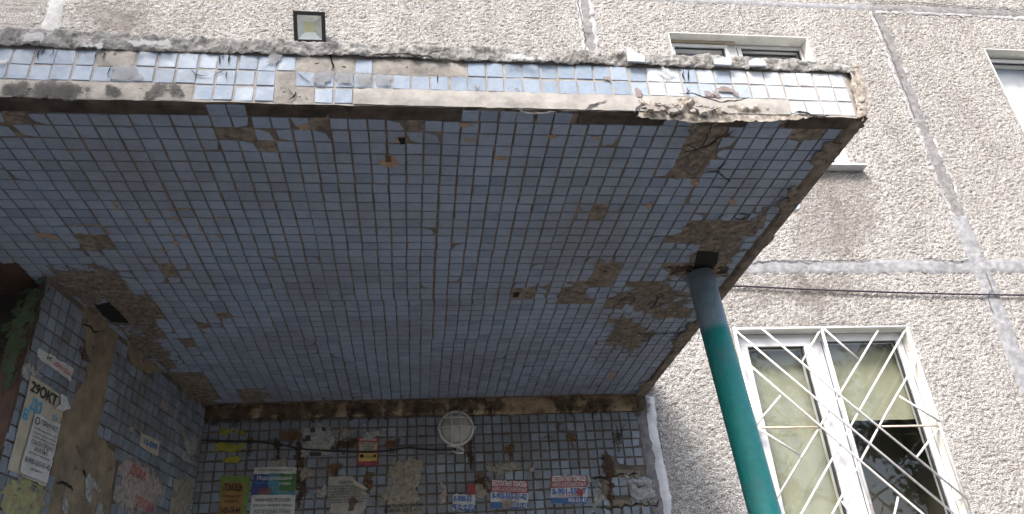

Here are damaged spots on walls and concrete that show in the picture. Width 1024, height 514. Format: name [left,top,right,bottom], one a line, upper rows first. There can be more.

peeling [0,79,194,101]
peeling [215,125,280,153]
peeling [272,52,844,186]
crack [680,69,749,188]
peeling [556,186,805,353]
peeling [34,224,231,514]